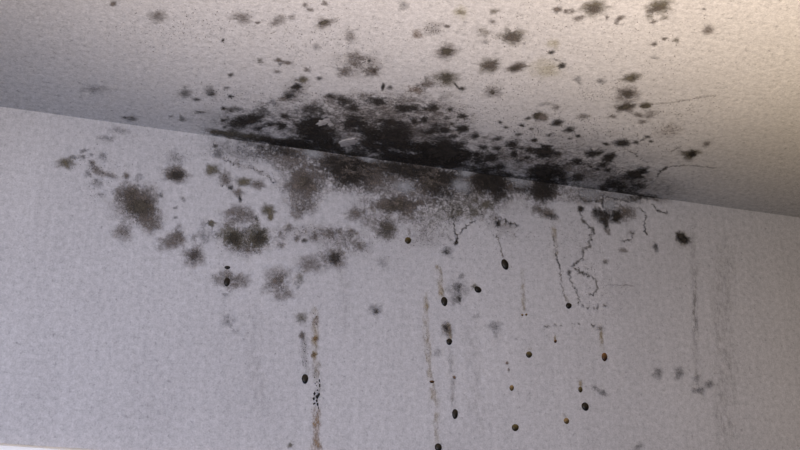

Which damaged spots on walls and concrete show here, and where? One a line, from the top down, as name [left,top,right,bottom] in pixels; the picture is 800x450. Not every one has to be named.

leakage [554,0,623,28]
leakage [648,1,668,33]
leakage [305,20,378,75]
leakage [480,28,532,72]
leakage [165,154,185,181]
leakage [205,63,682,253]
leakage [60,150,162,231]
leakage [165,232,205,261]
crack [560,196,665,306]